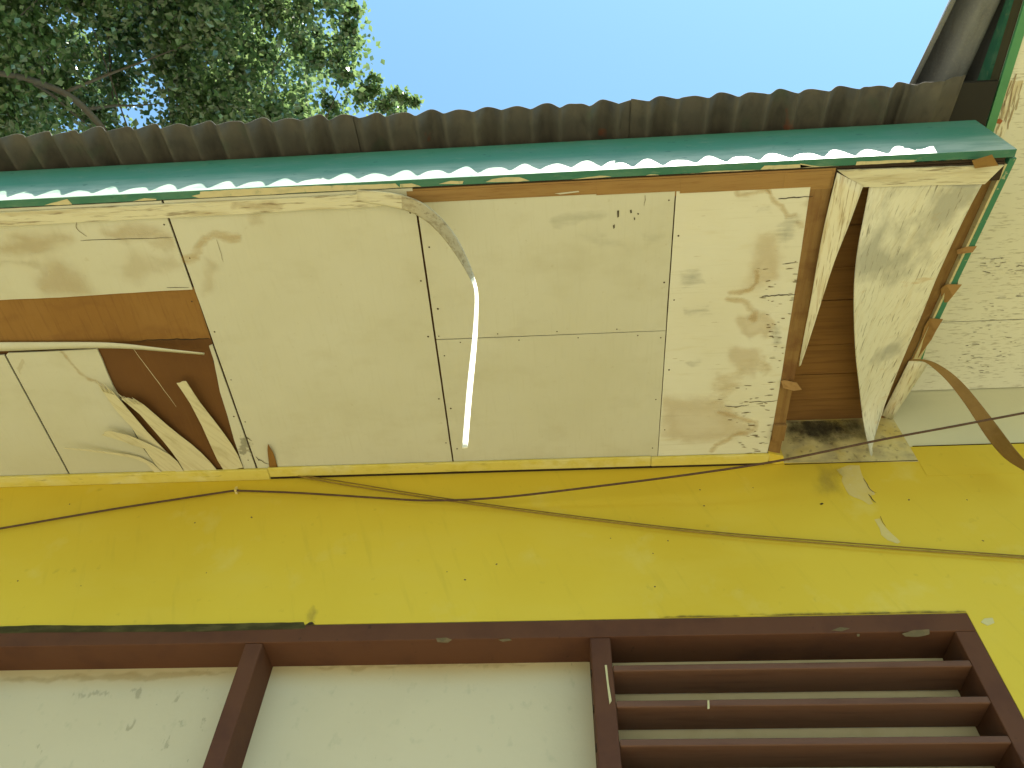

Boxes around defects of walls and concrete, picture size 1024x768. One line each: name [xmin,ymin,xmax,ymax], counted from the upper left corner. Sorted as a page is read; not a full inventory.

peeling [193,164,833,454]
peeling [0,287,277,472]
leakage [790,421,861,440]
spalling [837,465,876,505]
spalling [874,516,900,544]